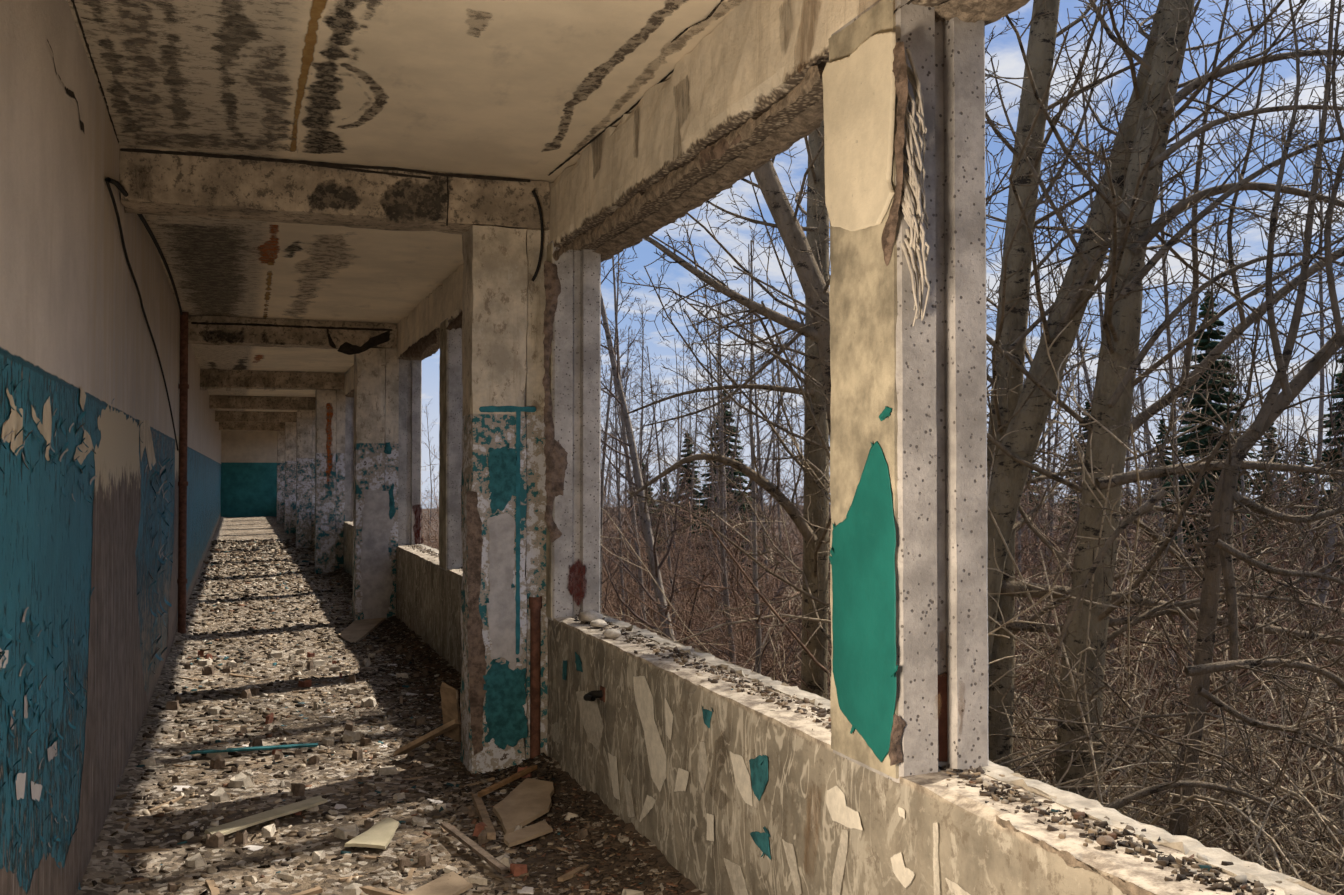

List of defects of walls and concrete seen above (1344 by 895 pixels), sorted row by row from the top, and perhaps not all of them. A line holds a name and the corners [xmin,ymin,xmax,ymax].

leakage [83,0,389,154]
leakage [162,224,255,370]
corrosion [258,225,280,319]
leakage [284,237,352,318]
leakage [307,180,360,212]
leakage [381,175,453,223]
spalling [542,65,824,543]
spalling [881,41,931,326]
peeling [0,364,179,895]
peeling [466,443,528,756]
corrosion [567,559,587,614]
peeling [829,441,906,766]